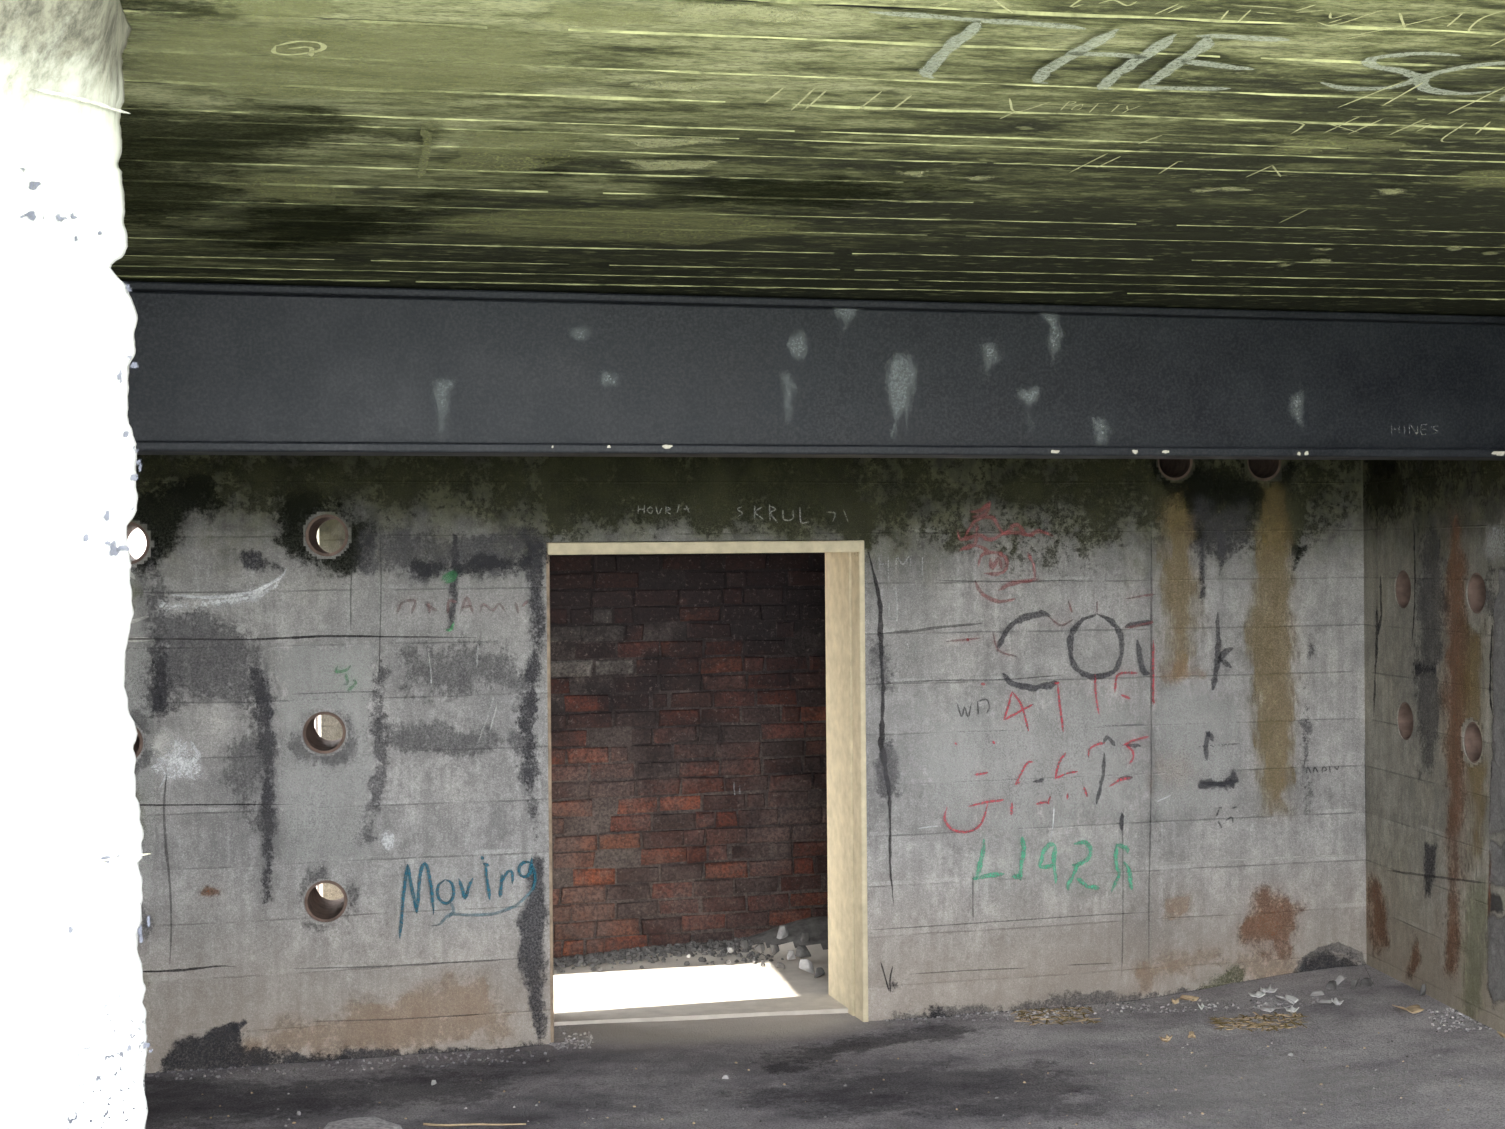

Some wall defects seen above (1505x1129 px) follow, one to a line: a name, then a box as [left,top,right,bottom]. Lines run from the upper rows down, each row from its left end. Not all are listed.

leakage [120,0,235,21]
leakage [118,99,468,255]
rust [1153,459,1296,813]
leakage [124,473,549,1059]
rust [1439,507,1487,978]
rust [1239,885,1304,959]
rust [1367,874,1389,954]
rust [1408,940,1422,980]